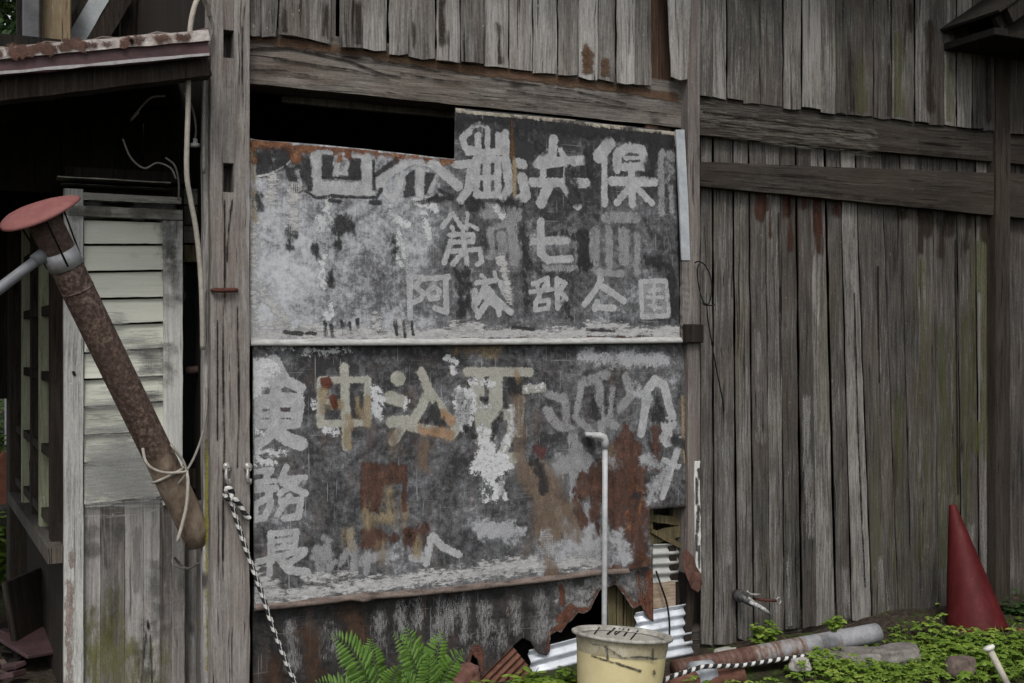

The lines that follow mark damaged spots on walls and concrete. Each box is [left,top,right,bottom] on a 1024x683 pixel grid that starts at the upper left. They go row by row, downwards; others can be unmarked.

corrosion [0,33,191,60]